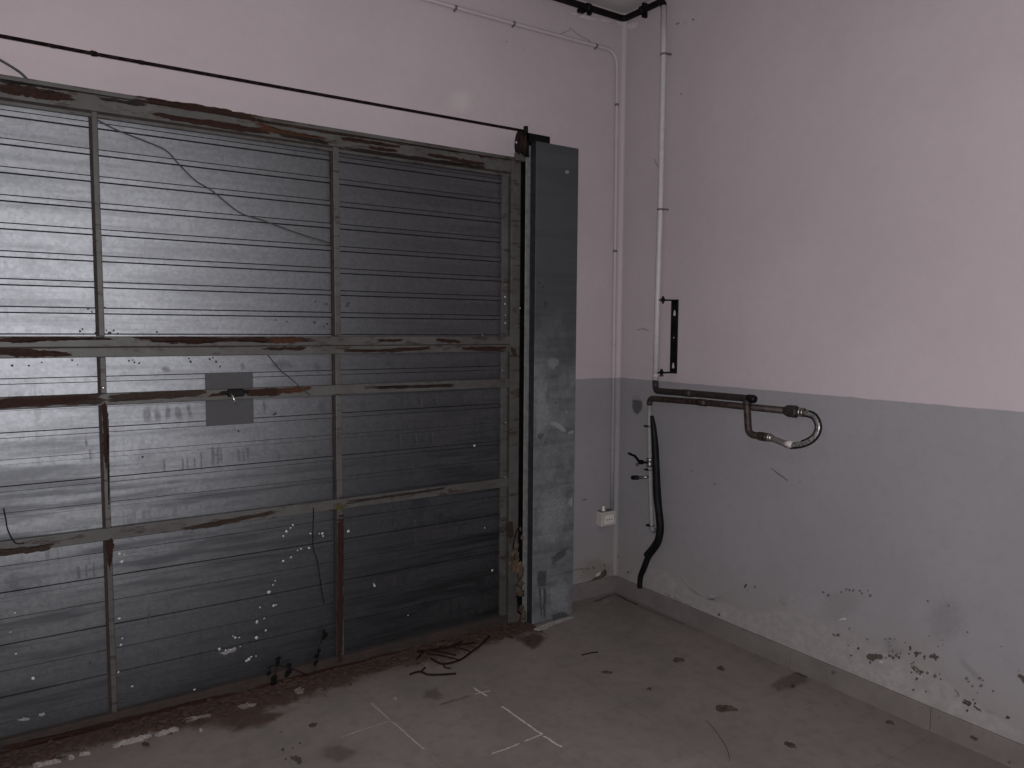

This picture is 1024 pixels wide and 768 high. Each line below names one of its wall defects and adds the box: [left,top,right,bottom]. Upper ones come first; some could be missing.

rust [0,80,79,101]
rust [0,117,118,358]
rust [97,95,492,336]
rust [0,336,547,768]
spalling [824,628,943,692]